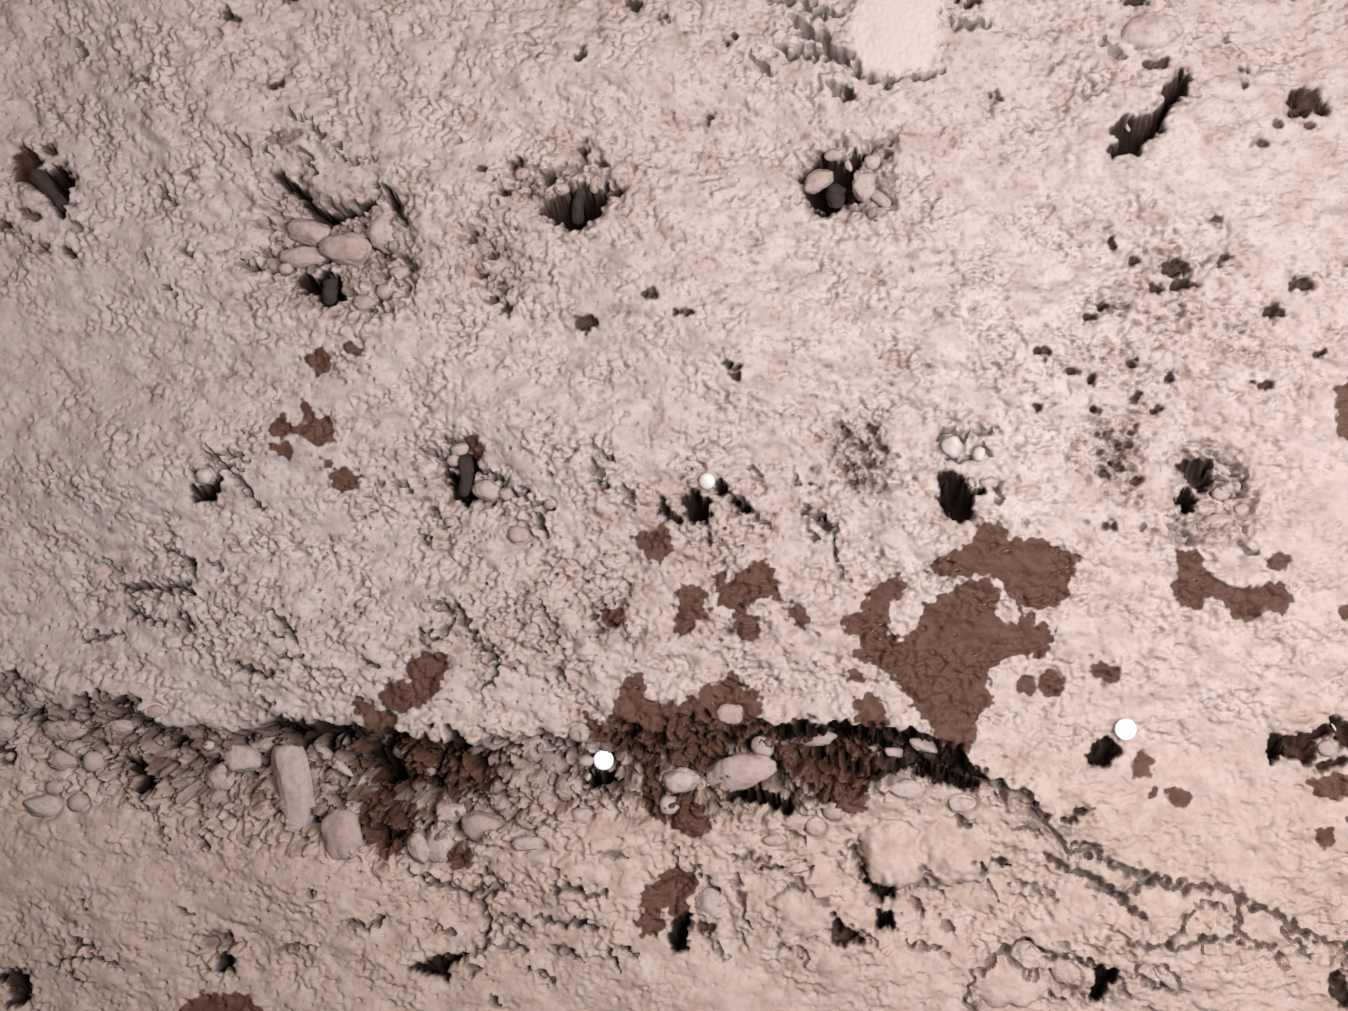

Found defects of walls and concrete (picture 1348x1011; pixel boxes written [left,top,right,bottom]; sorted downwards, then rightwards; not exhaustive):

hole [1097,35,1200,167]
hole [477,136,625,235]
hole [787,129,902,224]
spalling [232,170,422,325]
spalling [1260,715,1348,776]
crack [42,898,119,986]
crack [345,913,386,936]
spalling [0,669,1044,977]
crack [404,848,640,1009]
crack [730,830,841,912]
crack [953,813,973,829]
crack [979,805,1348,971]